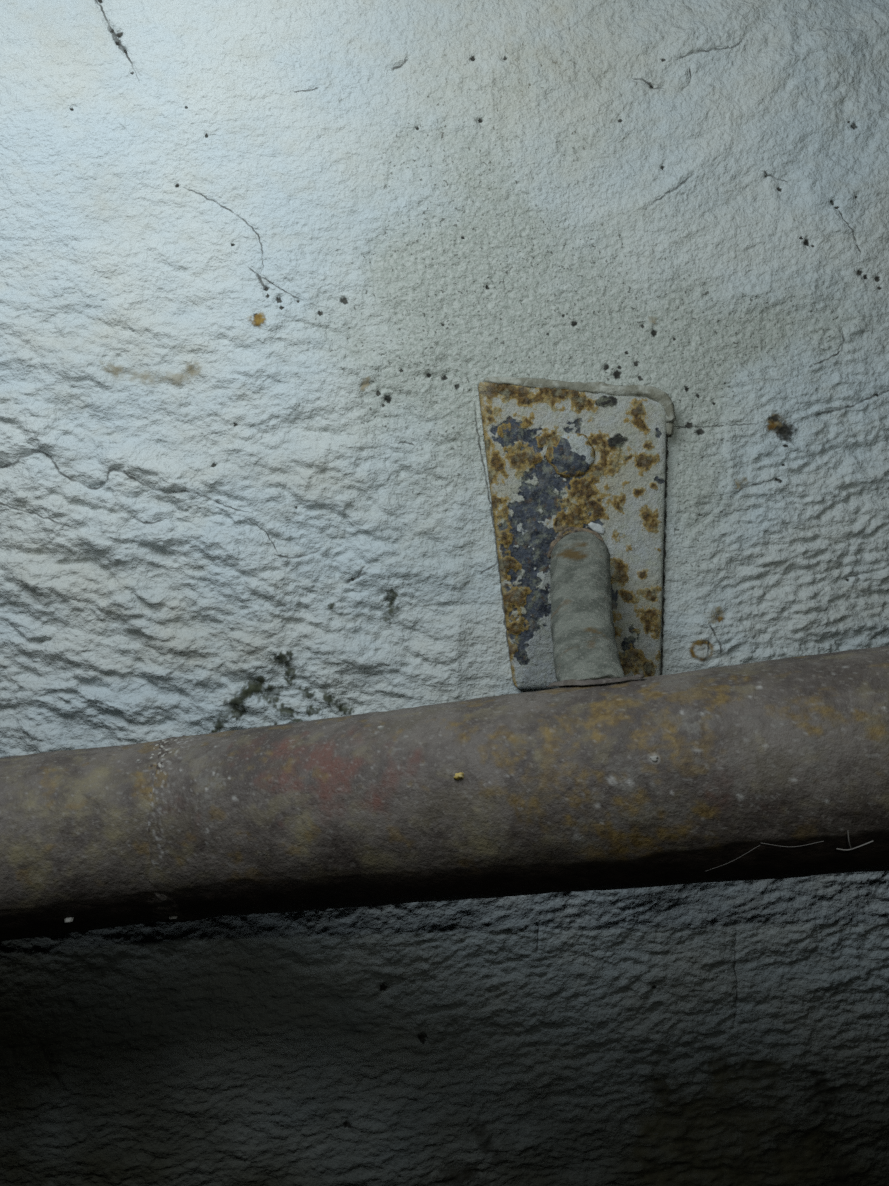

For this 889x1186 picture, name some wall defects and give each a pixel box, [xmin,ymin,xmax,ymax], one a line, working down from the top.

crack [96,0,134,74]
crack [191,190,298,310]
crack [816,390,889,416]
crack [0,450,136,489]
crack [173,490,303,557]
water stain [211,651,352,733]